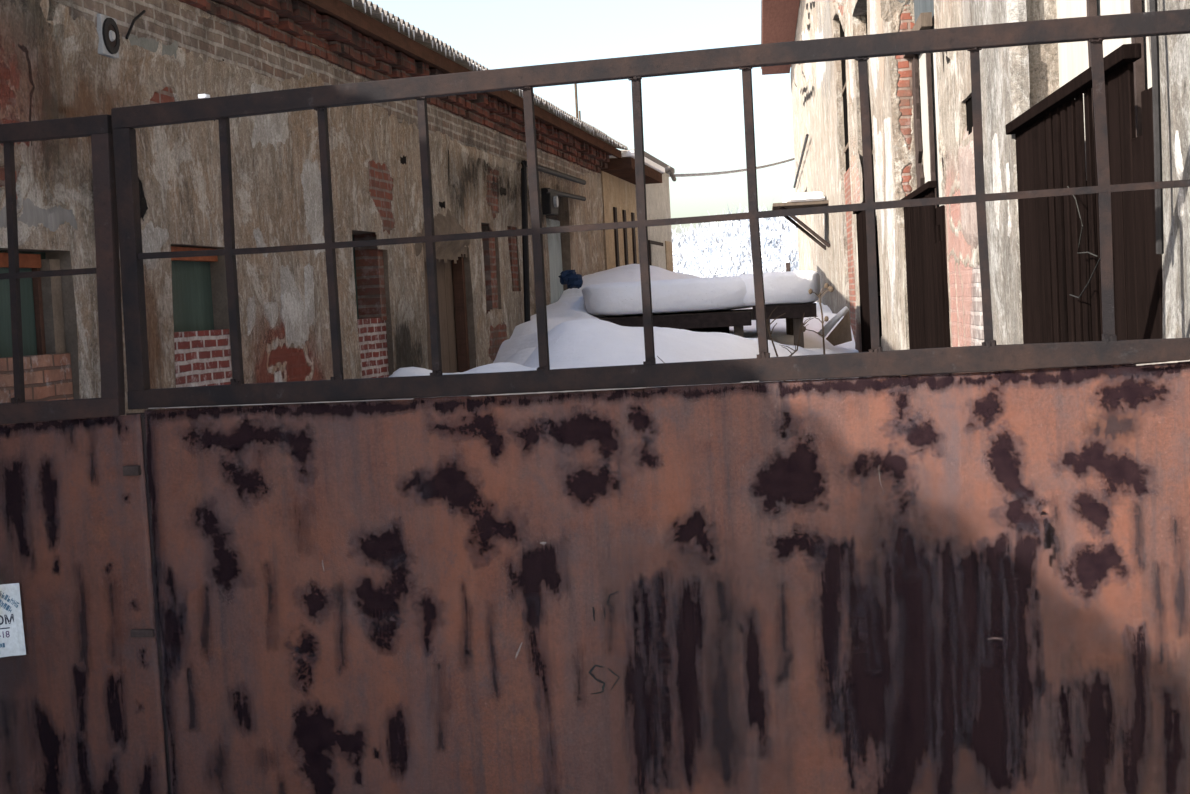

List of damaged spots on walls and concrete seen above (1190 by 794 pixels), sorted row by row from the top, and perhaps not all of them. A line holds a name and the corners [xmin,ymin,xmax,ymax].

flaking render [38,0,373,105]
peeling [251,112,289,151]
peeling [247,159,333,382]
flaking render [339,99,600,250]
flaking render [938,126,984,347]
peeling [992,133,1011,238]
corrosion [429,405,663,506]
corrosion [751,412,828,515]
corrosion [399,456,567,712]
corrosion [773,373,1185,794]
corrosion [292,631,408,794]
corrosion [607,571,737,794]